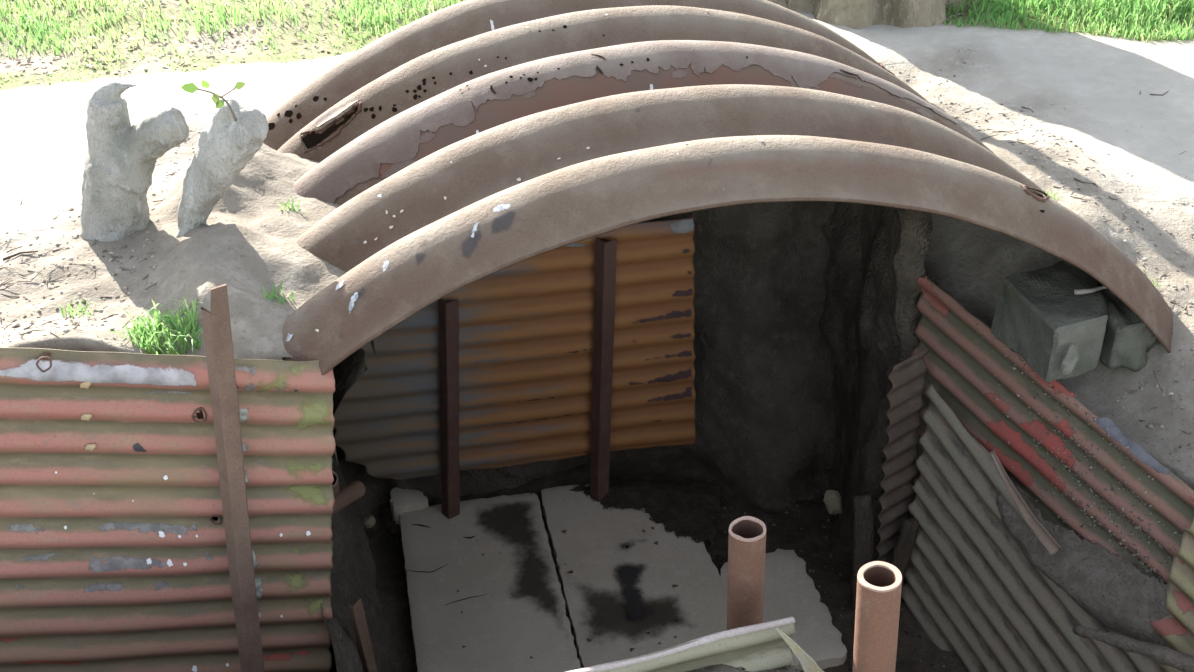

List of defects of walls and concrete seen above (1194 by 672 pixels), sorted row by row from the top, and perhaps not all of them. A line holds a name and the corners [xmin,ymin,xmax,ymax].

spalling [406,77,437,100]
corrosion [294,40,958,204]
peeling [0,360,196,386]
spalling [1023,344,1078,397]
peeling [977,393,1076,492]
peeling [1094,417,1170,474]
water stain [479,502,557,612]
water stain [586,565,683,639]
peeling [1150,591,1194,636]